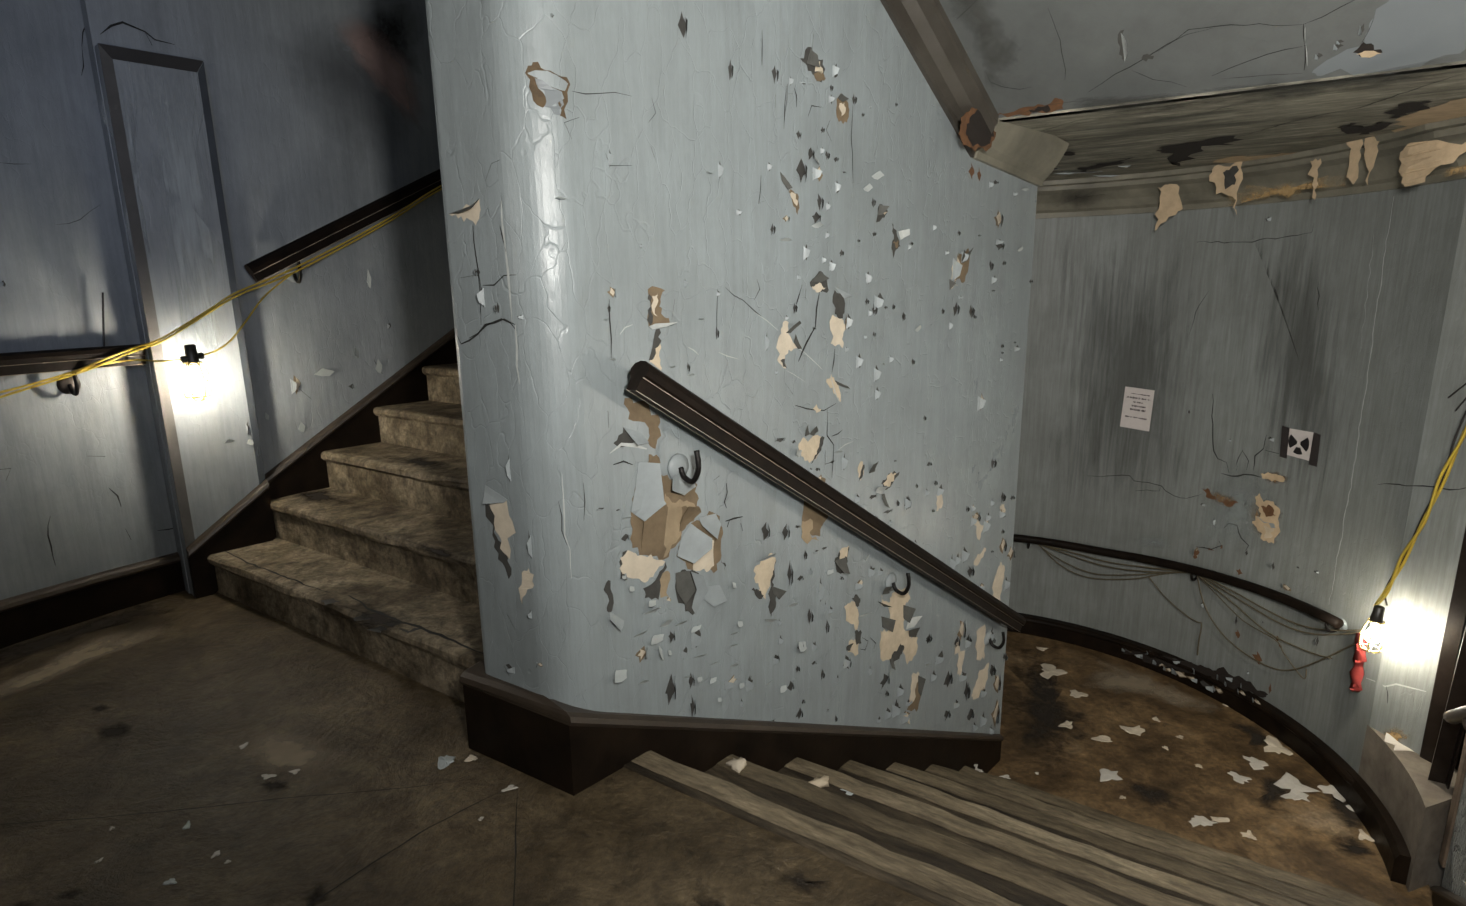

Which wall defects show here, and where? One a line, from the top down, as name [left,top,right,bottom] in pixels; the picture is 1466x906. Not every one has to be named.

crack [455,160,523,384]
peeling [647,286,678,372]
peeling [765,47,921,402]
rust [959,98,1064,151]
crack [982,0,1354,132]
peeling [1155,184,1183,230]
peeling [1157,74,1466,214]
peeling [1312,0,1466,76]
crack [1097,394,1279,499]
peeling [482,455,534,603]
peeling [604,398,1015,734]
peeling [1201,472,1285,575]